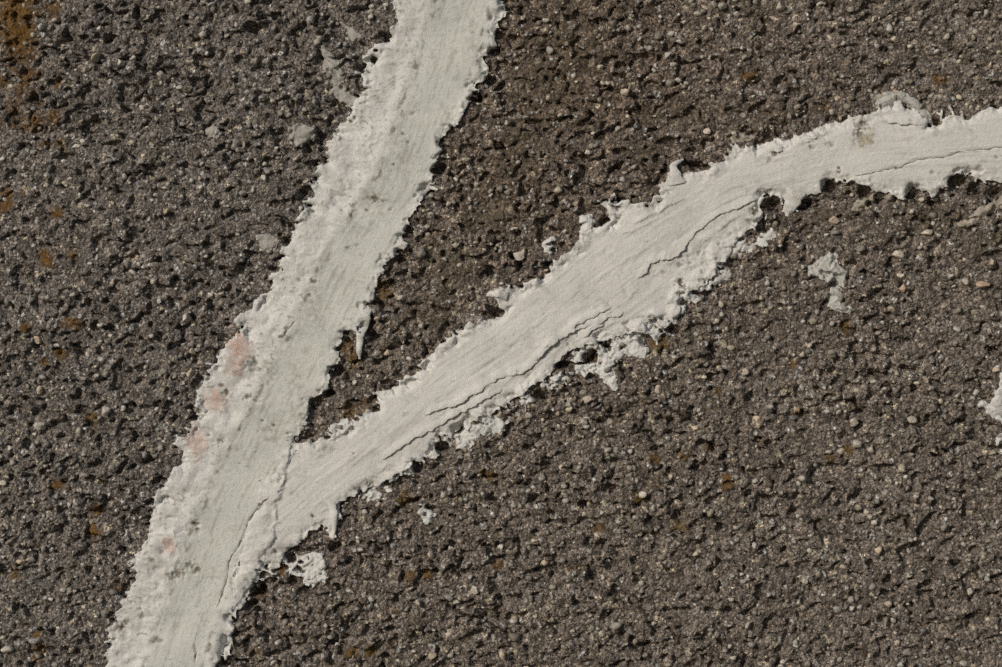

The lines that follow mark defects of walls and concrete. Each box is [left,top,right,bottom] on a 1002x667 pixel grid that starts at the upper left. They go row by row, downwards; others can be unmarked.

corrosion [0,0,35,85]
crack [104,0,509,667]
crack [229,91,1002,611]